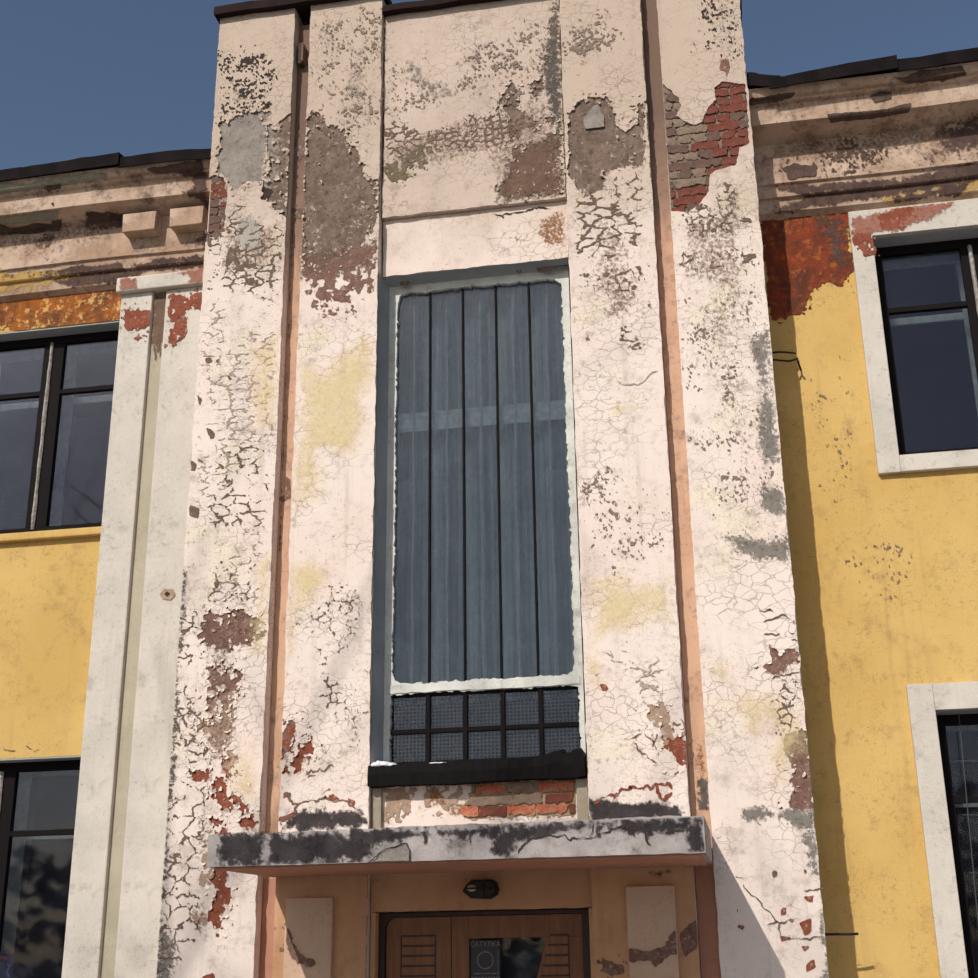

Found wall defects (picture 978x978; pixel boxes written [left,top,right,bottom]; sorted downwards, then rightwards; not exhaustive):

spalling [147,102,438,319]
peeling [663,59,795,213]
damp [749,329,781,469]
peeling [681,205,922,518]
crack [157,201,284,976]
damp [722,535,790,562]
peeling [184,597,269,834]
crack [493,627,684,856]
crack [770,664,802,733]
damp [214,778,709,866]
crack [735,876,820,941]
damp [740,805,820,880]